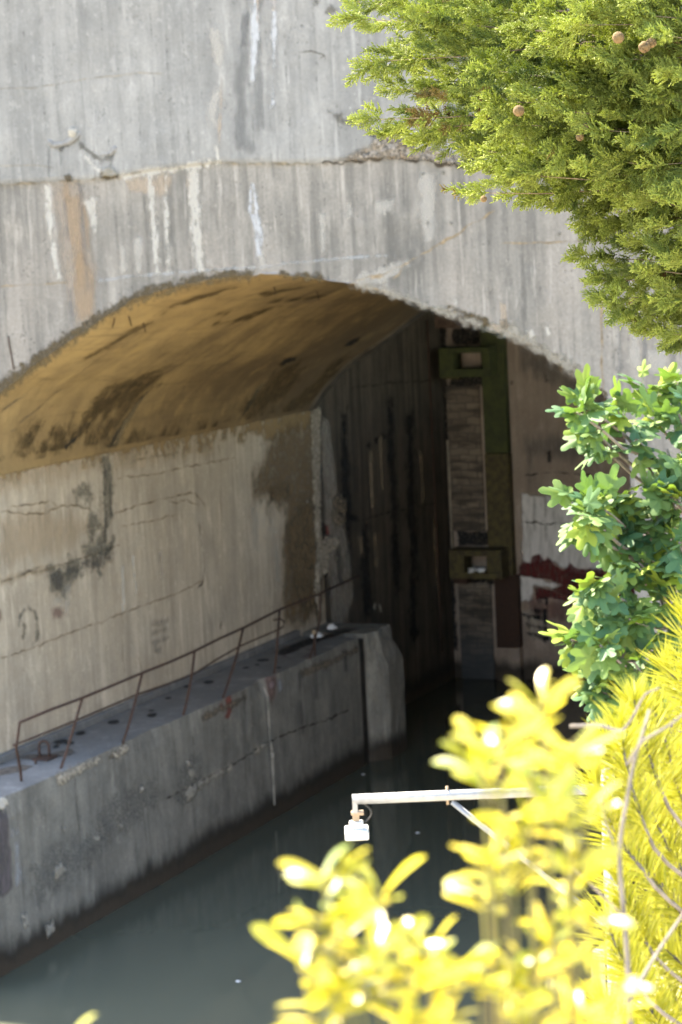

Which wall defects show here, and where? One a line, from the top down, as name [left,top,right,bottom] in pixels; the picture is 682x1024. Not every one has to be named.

water stain [249,0,277,81]
spalling [324,113,465,164]
corrosion [54,182,95,324]
crack [1,490,222,587]
water stain [252,419,323,623]
crack [166,706,371,799]
water stain [263,687,275,805]